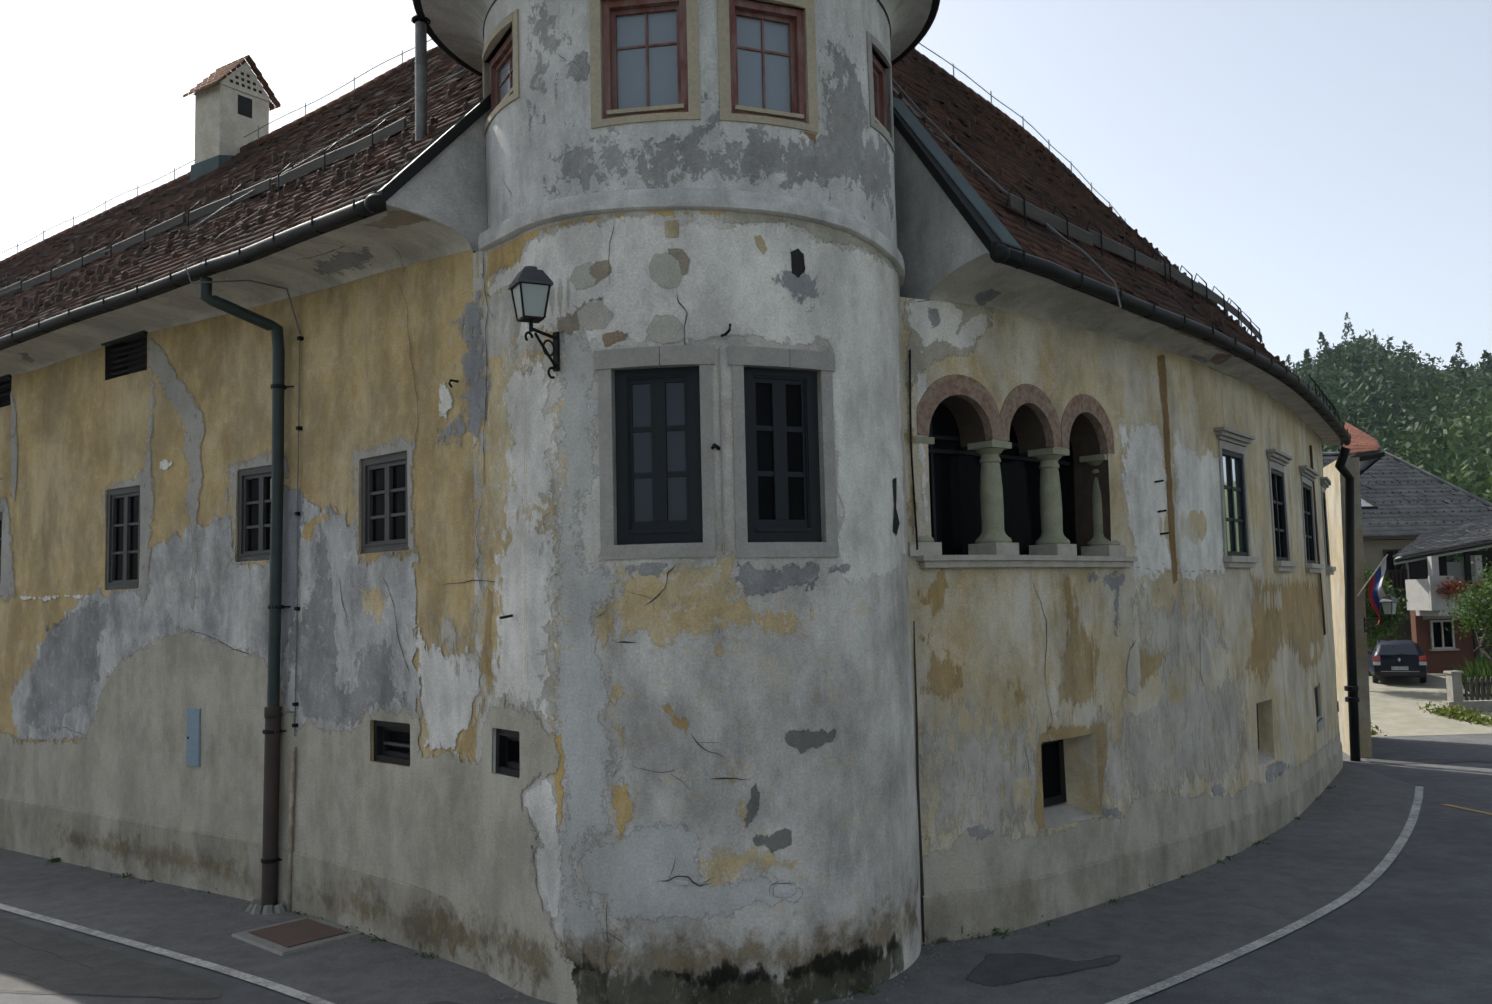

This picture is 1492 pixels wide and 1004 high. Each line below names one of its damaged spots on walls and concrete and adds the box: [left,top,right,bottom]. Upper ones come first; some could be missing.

flaking render [565,51,590,82]
peeling [1114,412,1225,590]
peeling [10,209,1001,923]
crack [664,858,715,886]
damp [323,883,918,987]